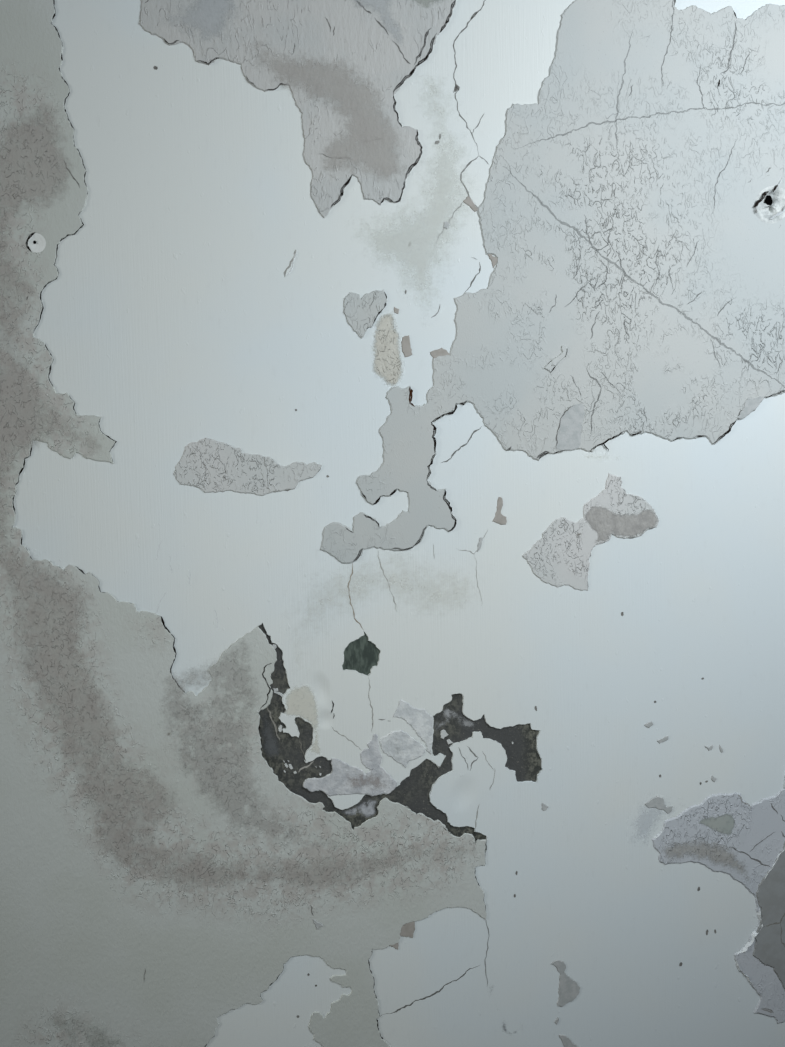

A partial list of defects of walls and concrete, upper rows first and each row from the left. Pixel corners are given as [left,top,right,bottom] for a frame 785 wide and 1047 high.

crack [435,0,488,245]
peeling [320,0,785,564]
peeling [0,0,542,1047]
damp [287,686,320,753]
crack [382,923,489,1015]
peeling [645,775,785,1023]